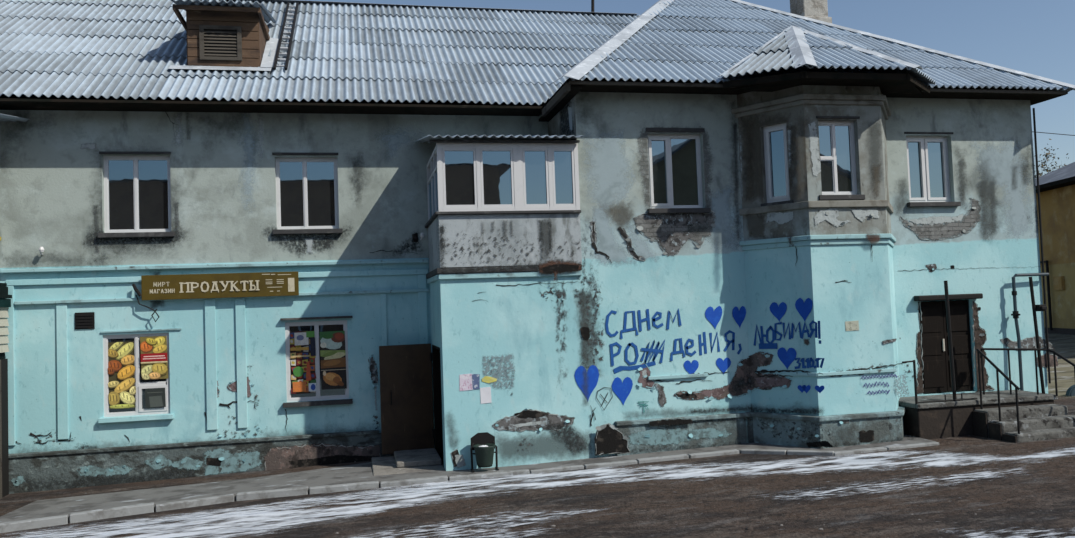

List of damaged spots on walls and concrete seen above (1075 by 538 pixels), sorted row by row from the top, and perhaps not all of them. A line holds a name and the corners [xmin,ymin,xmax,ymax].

flaking render [444,130,716,267]
peeling [814,208,879,227]
flaking render [899,198,981,241]
water stain [979,144,1039,234]
water stain [439,220,601,378]
peeling [77,464,133,477]
peeling [217,366,259,406]
flaking render [145,416,382,476]
peeling [368,355,379,429]
flaking render [492,409,575,432]
peeling [595,352,793,455]
flaking render [870,301,924,397]